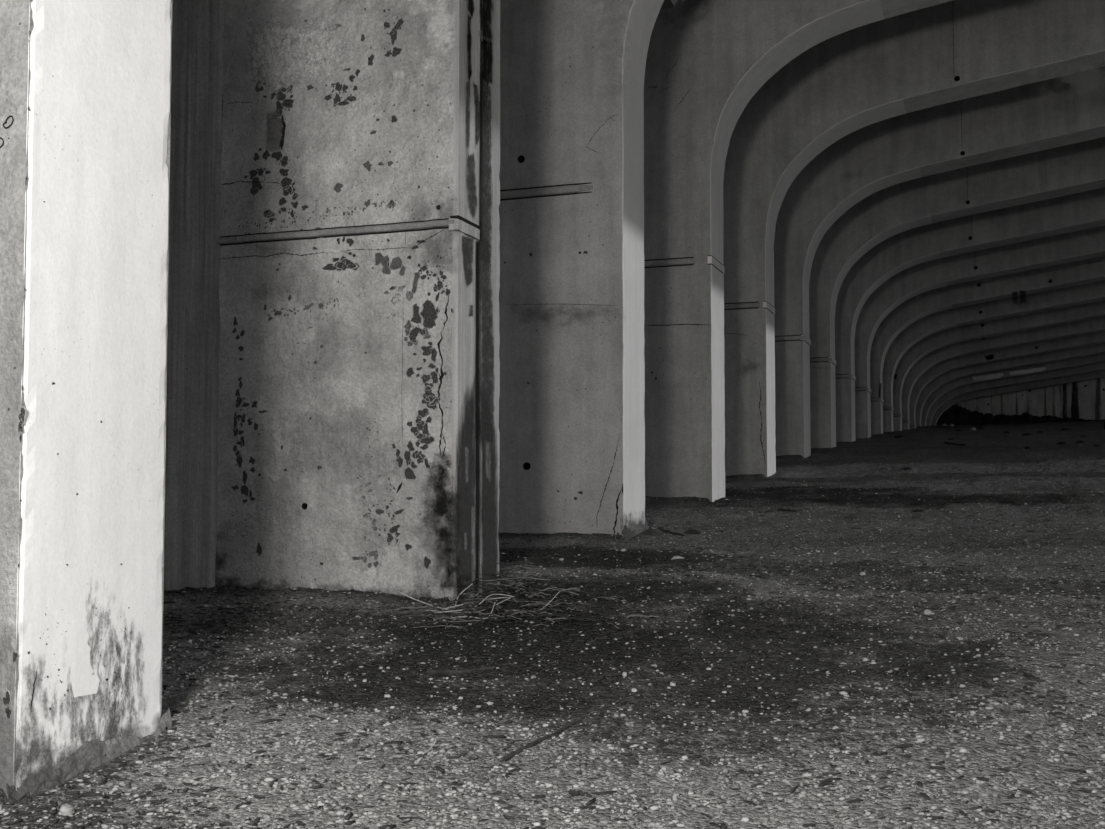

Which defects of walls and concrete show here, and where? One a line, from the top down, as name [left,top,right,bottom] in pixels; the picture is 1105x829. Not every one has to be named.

flaking render [249,9,410,119]
spalling [263,293,367,321]
peeling [462,81,511,444]
peeling [231,377,268,556]
water stain [426,241,498,603]
crack [596,438,621,535]
water stain [16,663,52,779]
water stain [61,618,141,744]